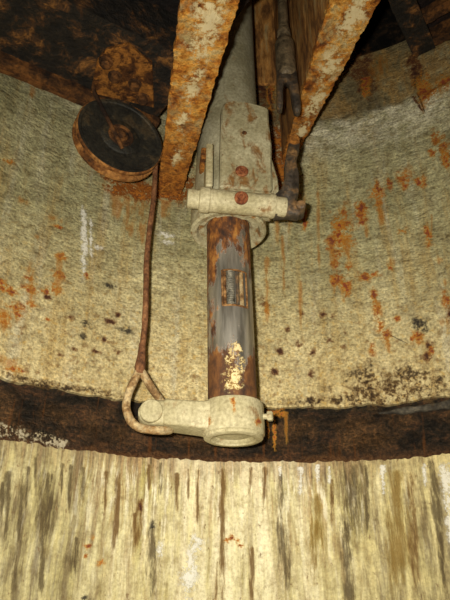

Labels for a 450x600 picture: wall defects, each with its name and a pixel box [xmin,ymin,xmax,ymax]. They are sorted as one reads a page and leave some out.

rust [100,174,195,203]
rust [326,201,368,297]
rust [0,270,66,327]
rust [370,290,392,346]
rust [410,332,434,360]
rust [256,409,285,445]
water stain [17,459,73,589]
water stain [113,475,121,548]
water stain [133,499,163,594]
water stain [277,467,290,585]
water stain [342,464,369,600]
water stain [422,461,450,584]